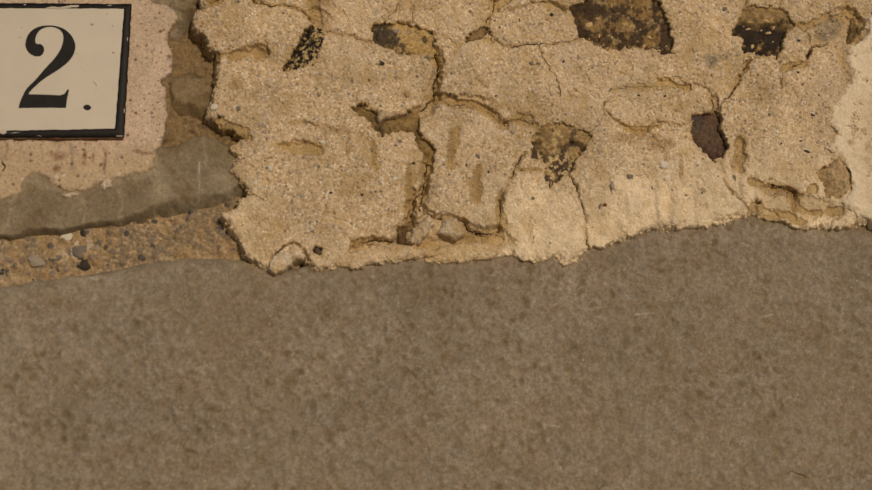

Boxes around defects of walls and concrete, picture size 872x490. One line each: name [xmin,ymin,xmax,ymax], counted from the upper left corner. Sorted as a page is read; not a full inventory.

hole [283,23,325,72]
spalling [371,23,436,56]
crack [486,1,568,121]
spalling [569,0,673,55]
spalling [732,3,794,57]
crack [420,56,529,124]
spalling [531,123,592,187]
spalling [690,112,726,160]
crack [412,154,536,235]
spalling [396,221,414,245]
crack [571,178,593,272]